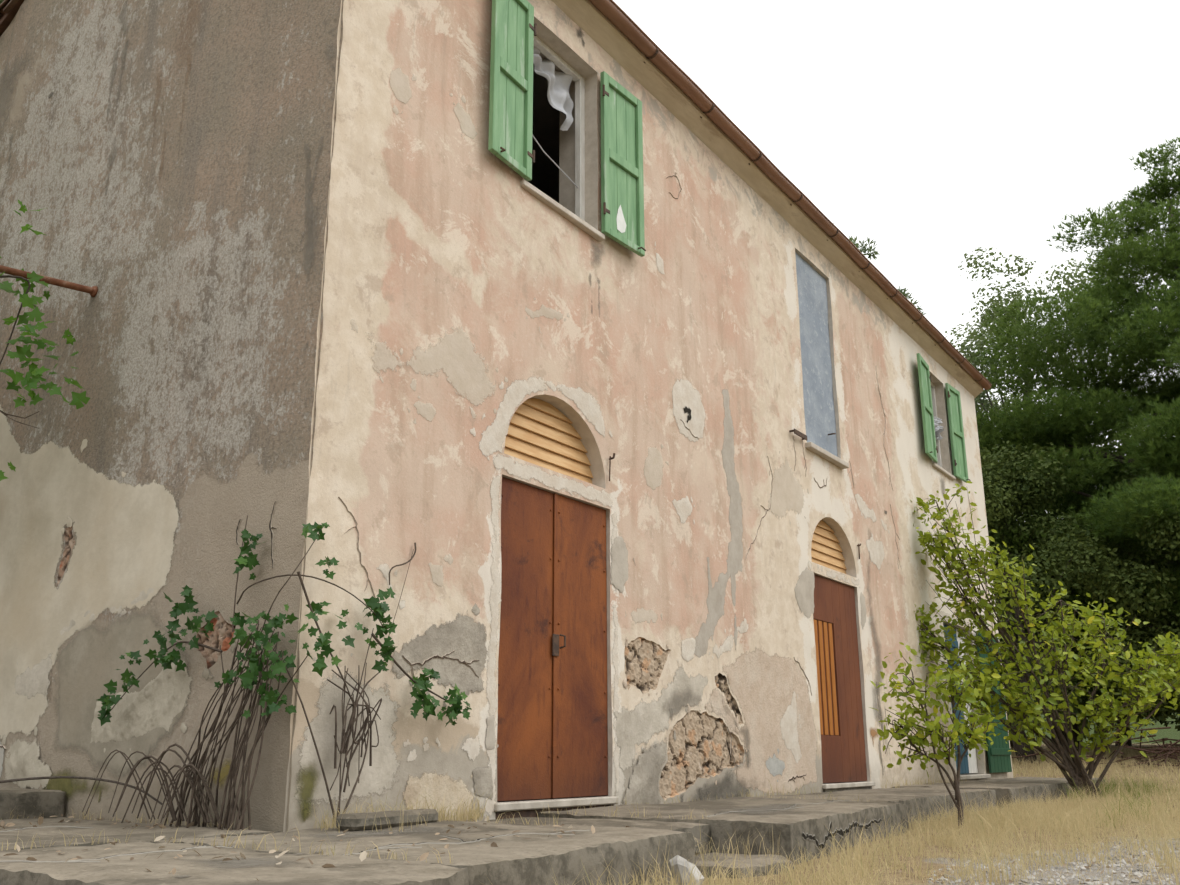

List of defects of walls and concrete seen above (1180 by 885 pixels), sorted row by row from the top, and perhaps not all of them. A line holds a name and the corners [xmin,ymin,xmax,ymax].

flaking render [57,516,76,586]
peeling [13,653,56,699]
flaking render [196,611,236,680]
peeling [623,618,817,800]
crack [704,774,883,850]